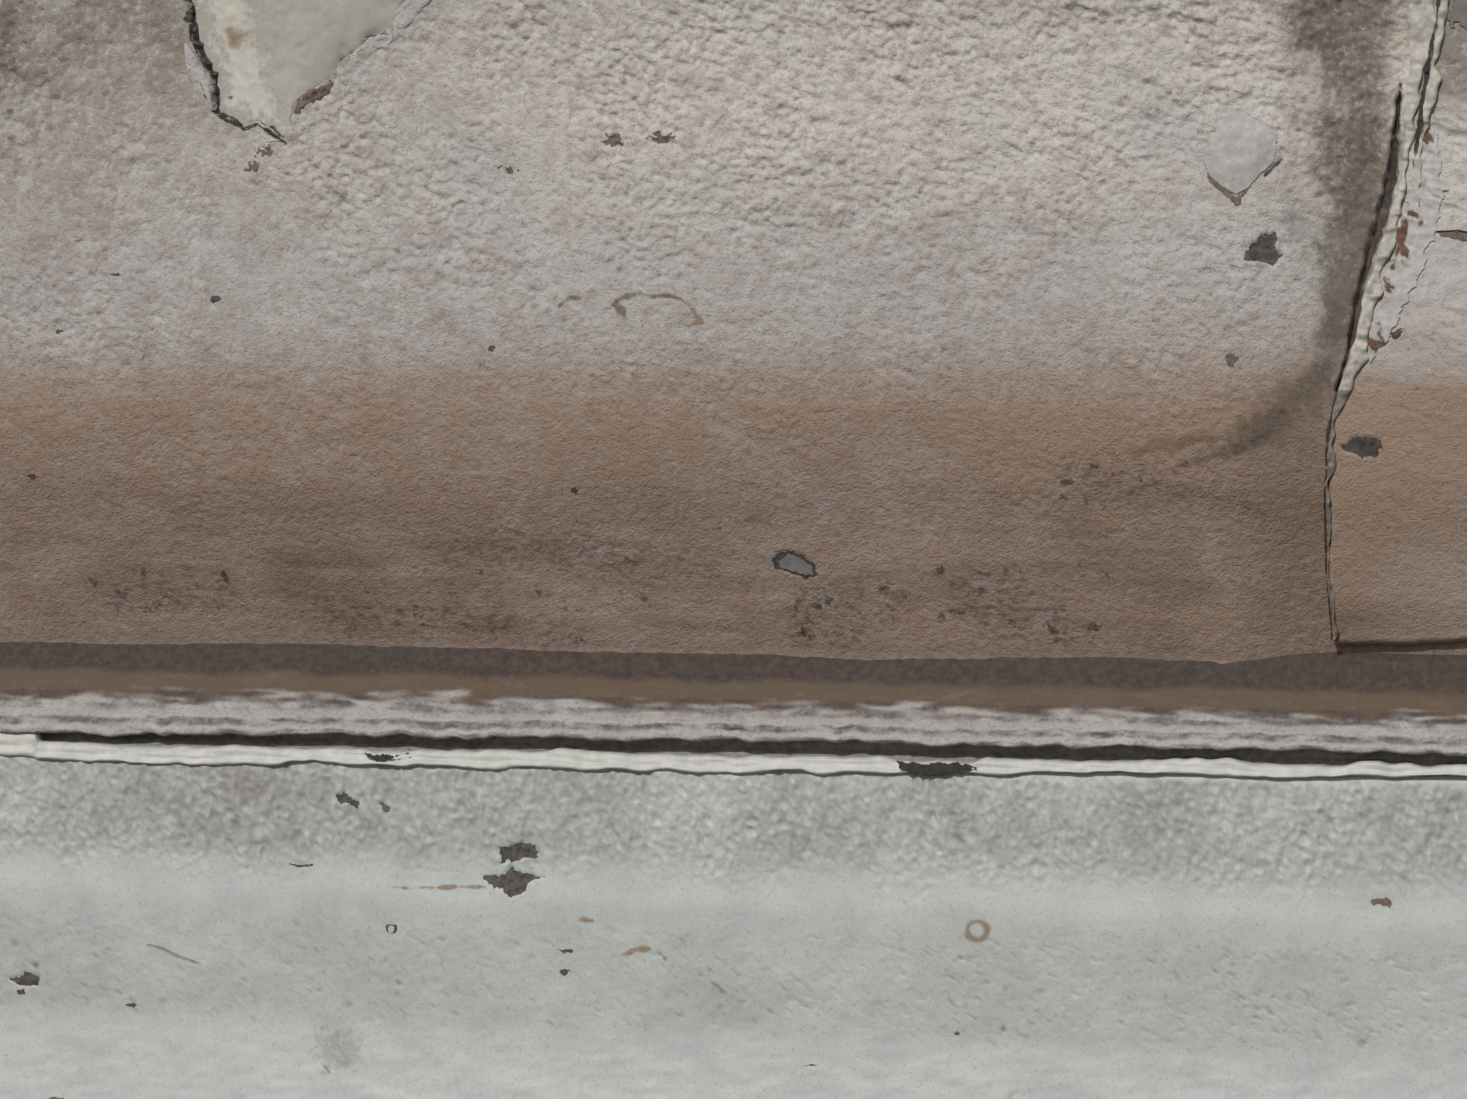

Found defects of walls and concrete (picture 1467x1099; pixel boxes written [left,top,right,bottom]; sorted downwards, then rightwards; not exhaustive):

peeling [184,0,431,172]
spalling [599,133,624,147]
spalling [646,130,676,144]
water stain [1294,0,1399,344]
crack [1433,222,1467,241]
peeling [1244,232,1282,266]
crack [1323,0,1440,639]
peeling [1341,436,1383,459]
peeling [772,550,818,579]
peeling [483,842,545,897]